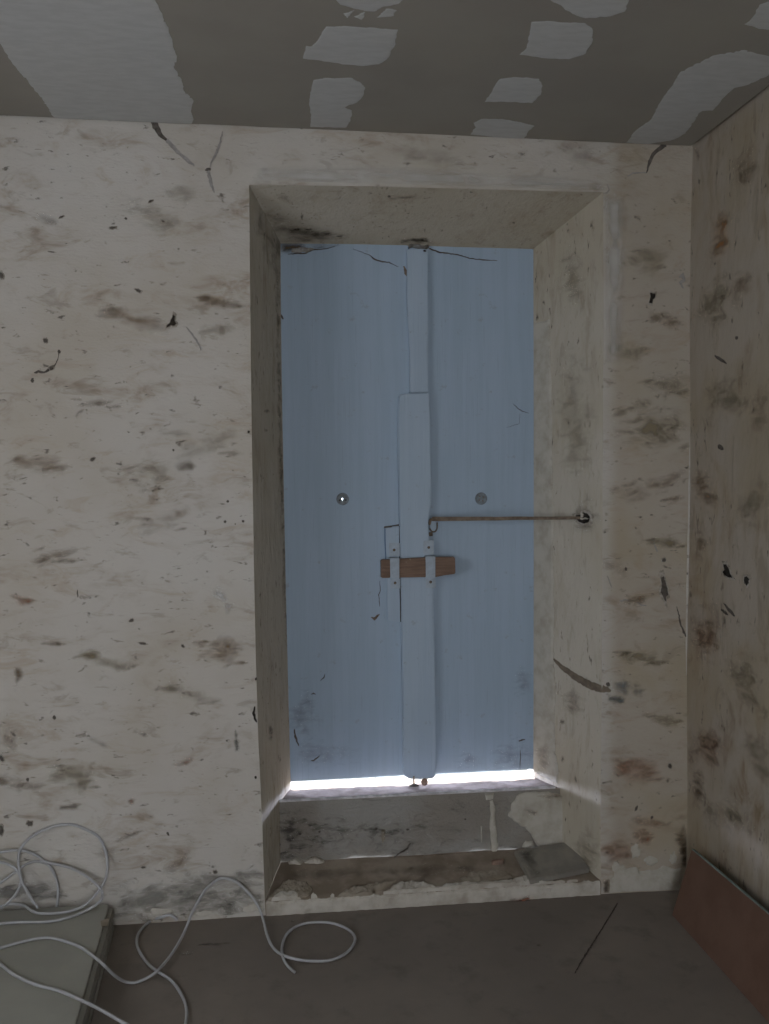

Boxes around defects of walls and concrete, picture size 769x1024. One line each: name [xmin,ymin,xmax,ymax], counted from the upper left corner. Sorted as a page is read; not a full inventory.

crack [151,122,223,193]
crack [603,145,667,194]
crack [288,246,398,267]
crack [429,248,497,261]
peeling [508,791,563,849]
damp [0,884,48,898]
damp [122,881,201,916]
flaking render [266,843,686,916]